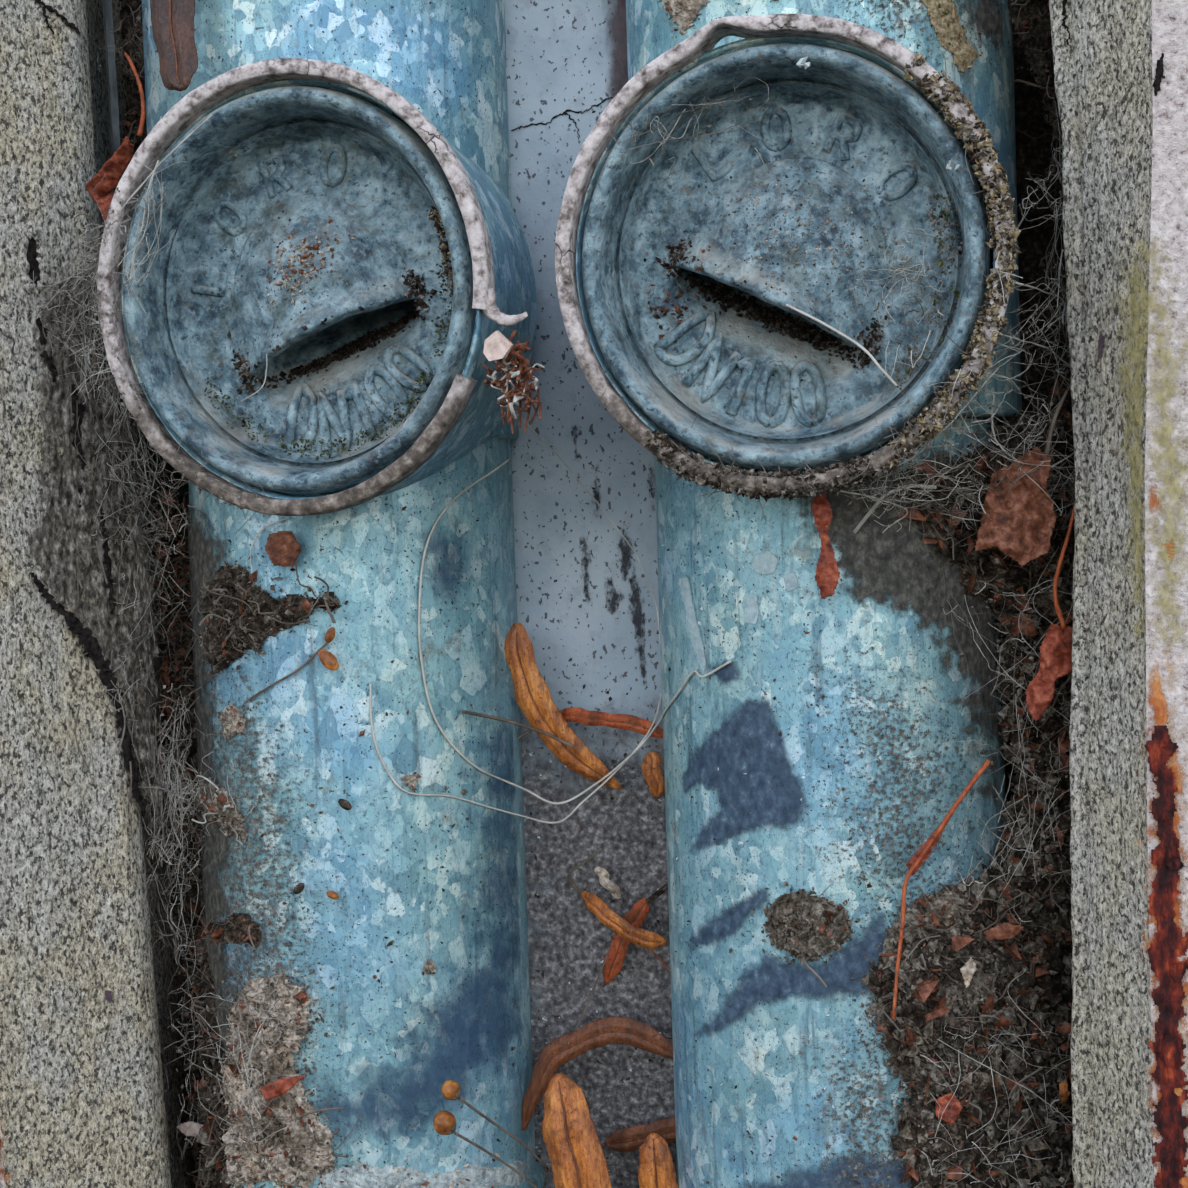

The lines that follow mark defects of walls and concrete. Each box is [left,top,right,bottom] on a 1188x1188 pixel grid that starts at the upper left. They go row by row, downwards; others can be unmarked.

crack [35,0,81,36]
crack [511,97,613,139]
corrosion [1150,486,1161,511]
corrosion [1139,665,1188,1188]